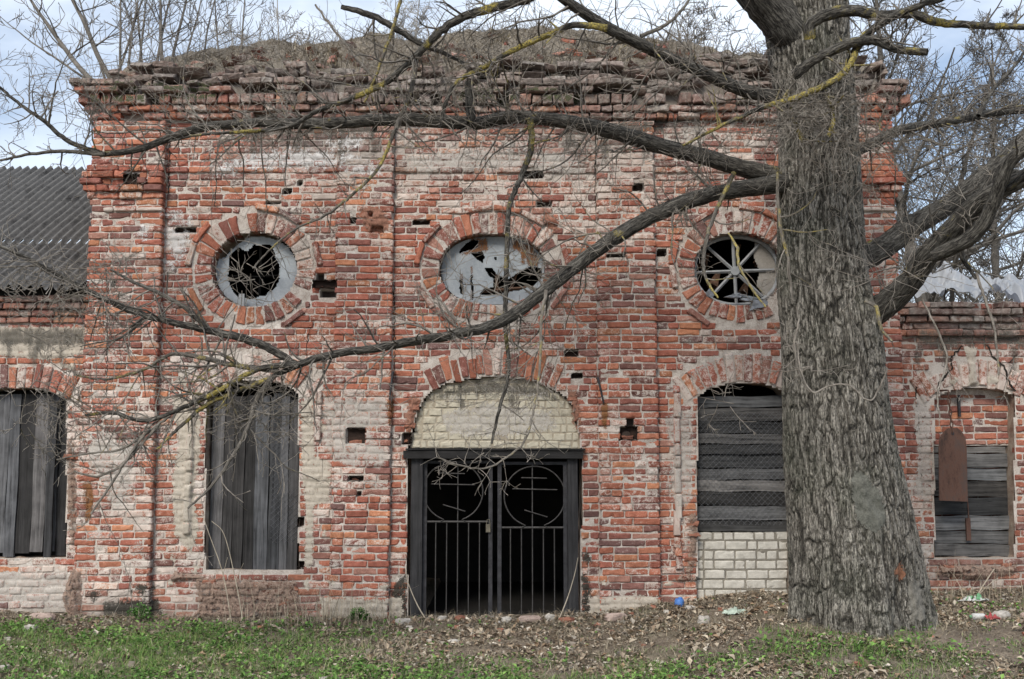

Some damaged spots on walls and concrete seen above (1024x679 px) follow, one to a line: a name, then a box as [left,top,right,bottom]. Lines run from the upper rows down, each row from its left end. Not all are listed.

crack [914,343,1018,479]